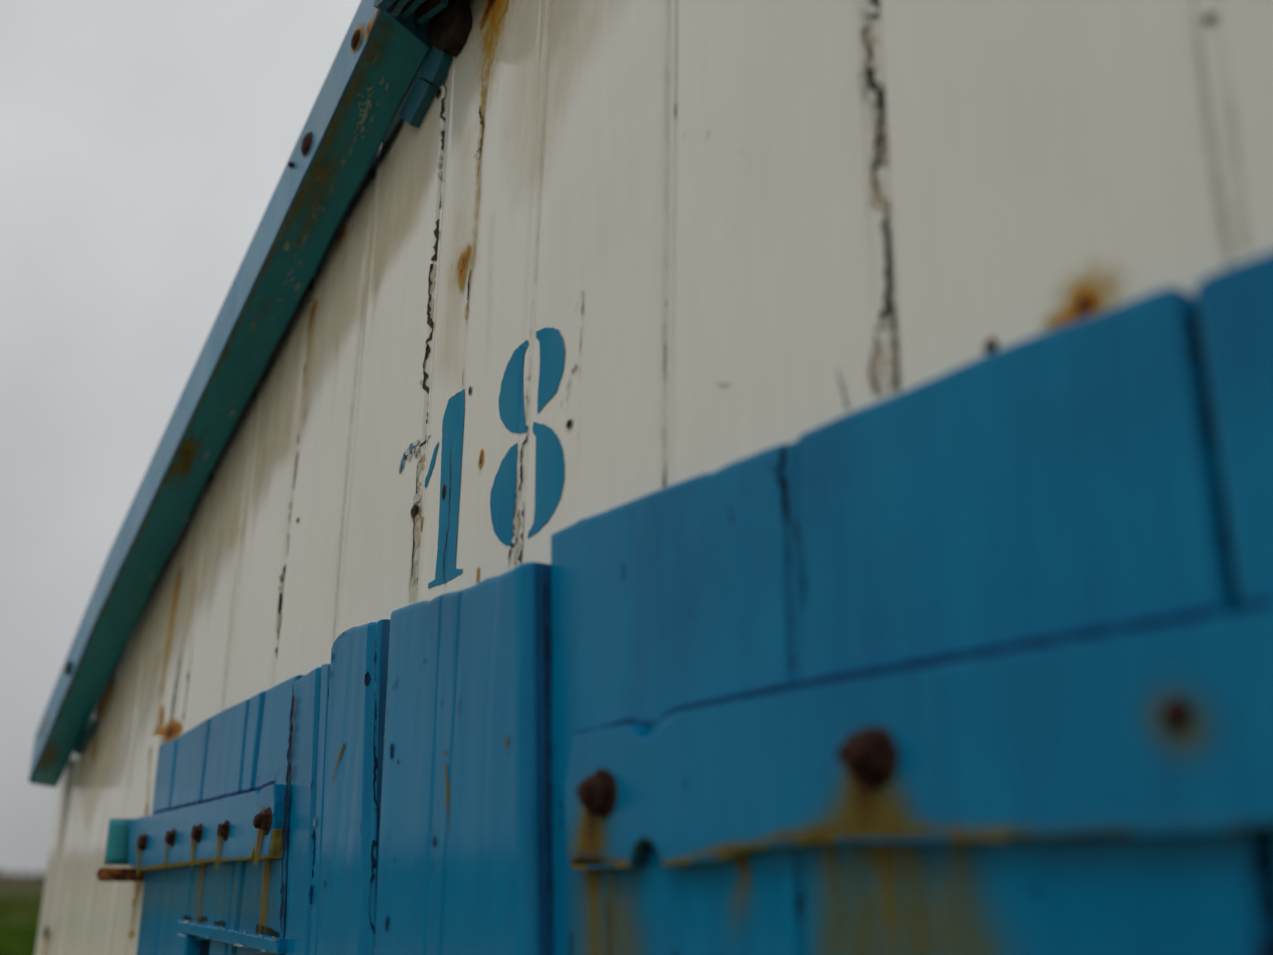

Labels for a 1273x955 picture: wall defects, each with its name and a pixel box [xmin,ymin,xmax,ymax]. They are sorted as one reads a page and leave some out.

corrosion [477,0,508,175]
corrosion [127,9,380,558]
crack [409,78,484,602]
corrosion [457,245,471,290]
crack [837,0,899,409]
corrosion [1047,279,1113,330]
peeling [398,434,431,474]
corrosion [36,576,119,773]
corrosion [145,706,182,816]
corrosion [129,829,270,937]
corrosion [570,806,628,955]
corrosion [688,769,1027,886]